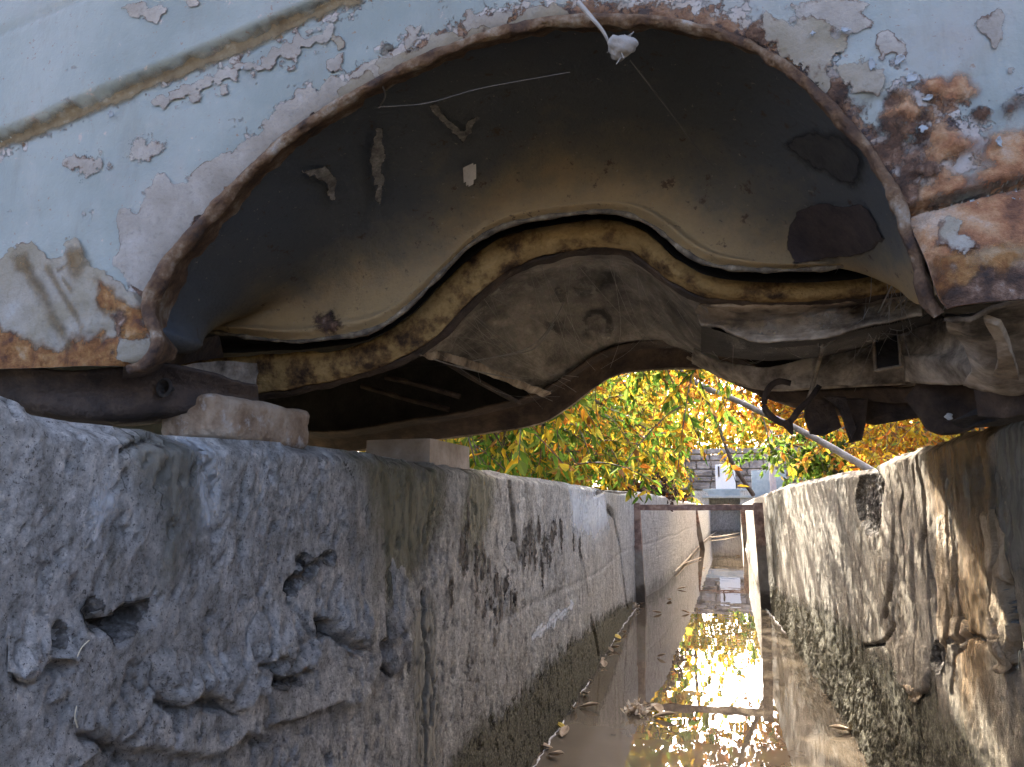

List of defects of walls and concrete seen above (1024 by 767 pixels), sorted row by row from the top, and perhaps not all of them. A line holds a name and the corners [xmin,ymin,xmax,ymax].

water stain [463,469,492,548]
water stain [571,489,609,538]
flaking render [855,465,896,619]
spalling [283,549,337,597]
spalling [80,595,150,646]